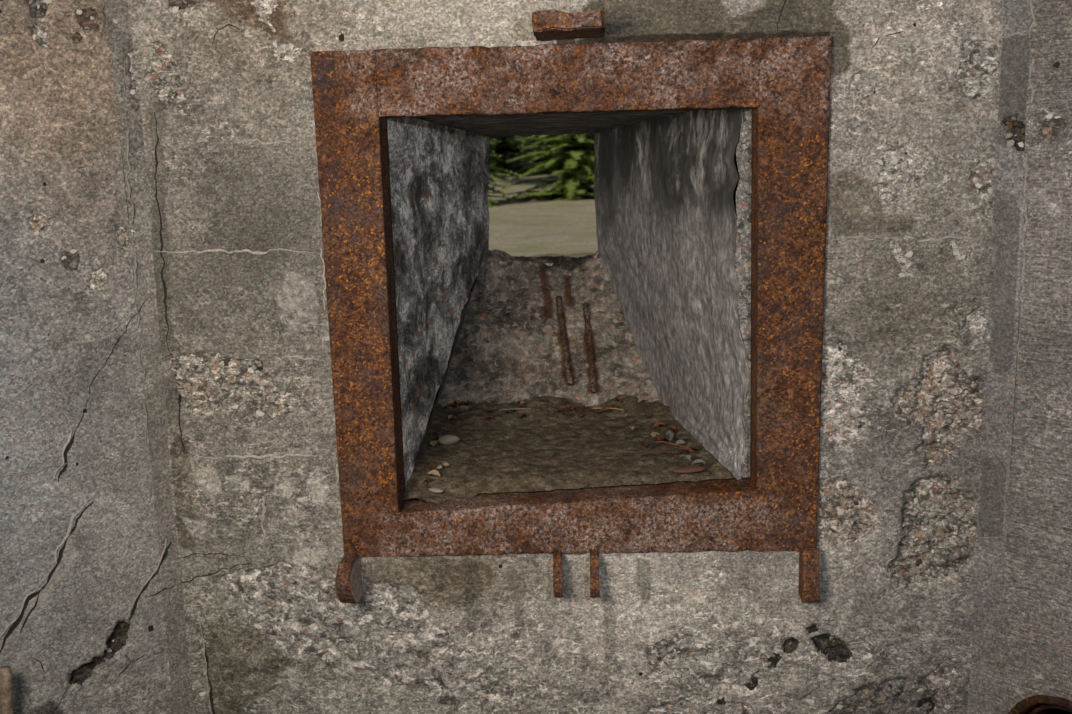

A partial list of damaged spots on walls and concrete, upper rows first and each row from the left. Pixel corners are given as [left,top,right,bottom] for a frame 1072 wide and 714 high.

crack [0,499,93,652]
crack [123,540,251,622]
hole [69,621,130,685]
spalling [221,560,515,712]
spalling [638,624,852,714]